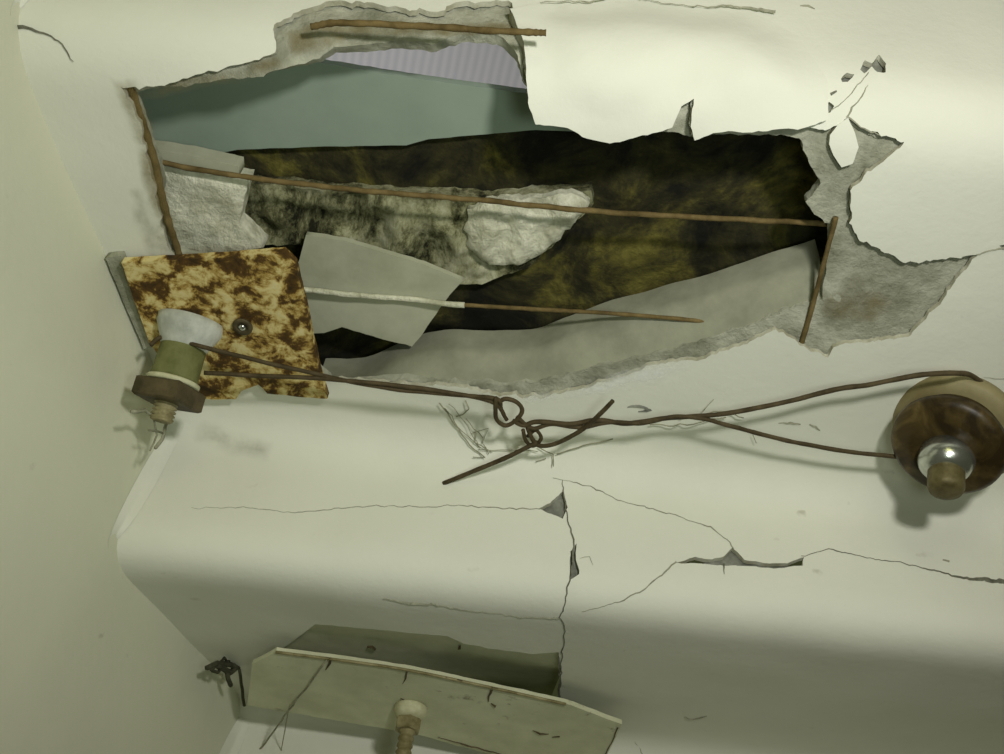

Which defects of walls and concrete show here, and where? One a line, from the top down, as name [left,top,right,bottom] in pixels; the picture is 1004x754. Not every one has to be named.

crack [540,0,600,8]
crack [651,0,776,13]
crack [17,25,74,62]
spalling [126,5,526,254]
spalling [661,101,693,137]
spalling [321,118,971,396]
crack [191,478,1004,698]